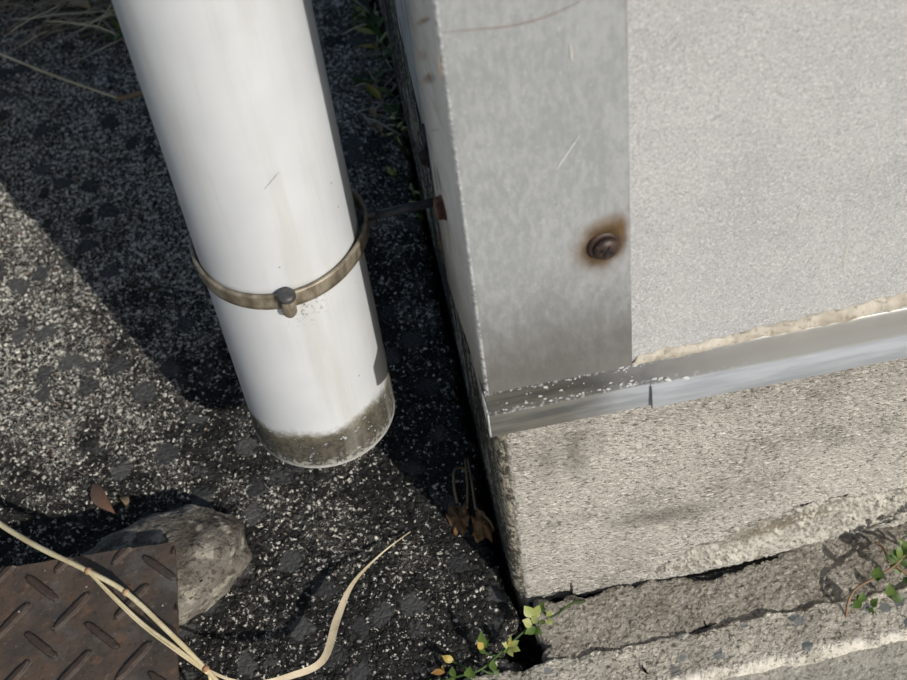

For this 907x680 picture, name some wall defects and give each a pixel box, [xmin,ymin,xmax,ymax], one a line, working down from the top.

corrosion [583,222,624,262]
spalling [655,487,907,575]
crack [670,556,779,581]